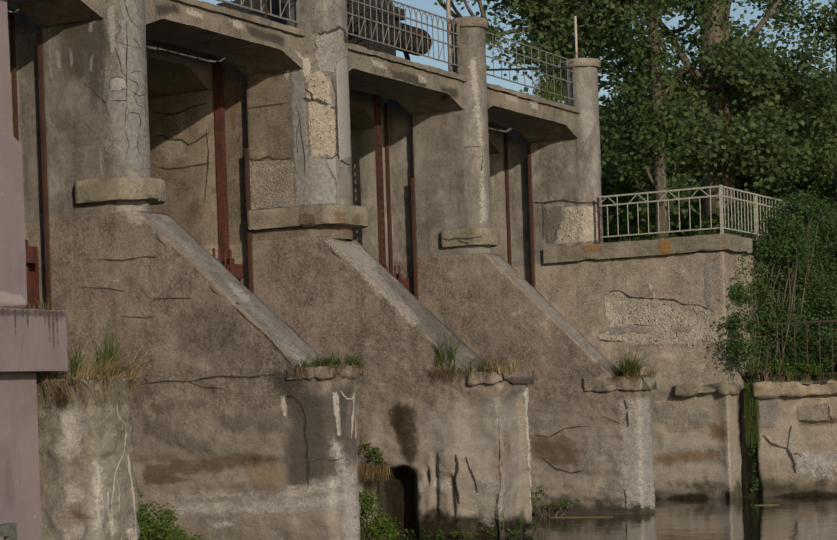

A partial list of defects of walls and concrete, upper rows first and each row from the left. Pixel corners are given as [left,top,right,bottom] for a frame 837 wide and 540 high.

crack [85,0,210,201]
spalling [305,29,351,183]
spalling [544,205,601,244]
peeling [0,291,25,307]
spalling [597,264,719,348]
leakage [55,386,87,461]
leakage [61,435,138,540]
leakage [174,388,532,540]
crack [454,454,478,504]
crack [763,406,834,473]